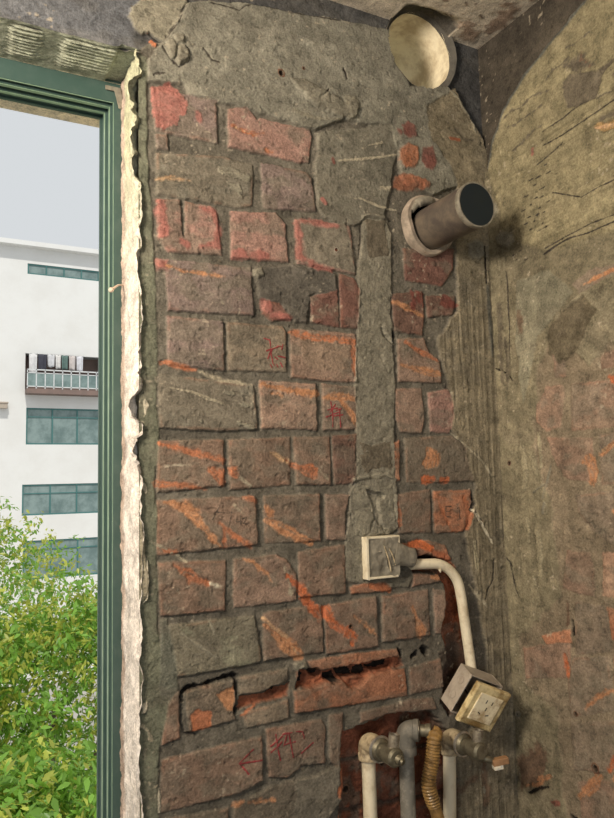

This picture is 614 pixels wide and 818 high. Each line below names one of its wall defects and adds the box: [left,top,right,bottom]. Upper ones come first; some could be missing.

crack [536,98,614,166]
crack [552,179,614,198]
crack [543,214,614,256]
spalling [215,615,405,717]
spalling [189,708,214,733]